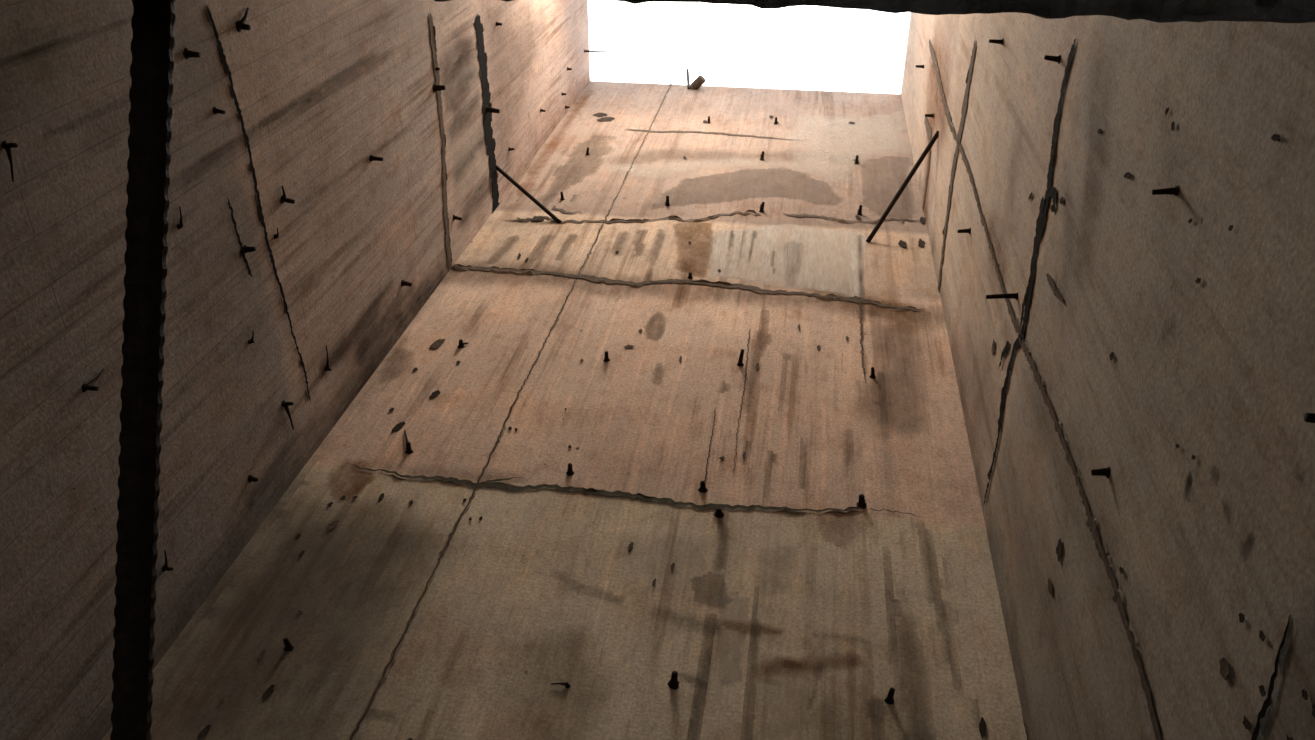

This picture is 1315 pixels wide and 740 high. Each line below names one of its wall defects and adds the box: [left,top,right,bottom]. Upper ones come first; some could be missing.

crack [204,6,311,403]
crack [349,13,1160,740]
crack [1251,614,1291,740]